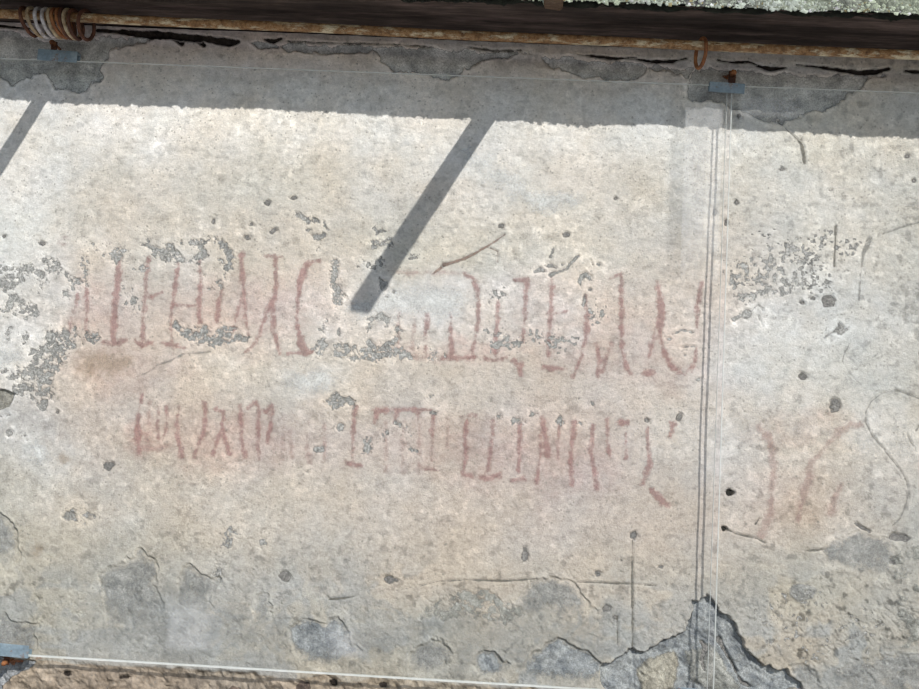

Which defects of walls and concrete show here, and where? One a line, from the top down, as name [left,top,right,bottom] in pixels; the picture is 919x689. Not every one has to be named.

flaking render [0,31,160,94]
flaking render [252,42,527,80]
flaking render [542,56,869,125]
spalling [0,256,90,320]
spalling [718,229,862,321]
spalling [1,326,101,413]
spalling [827,523,919,579]
spalling [527,585,919,689]